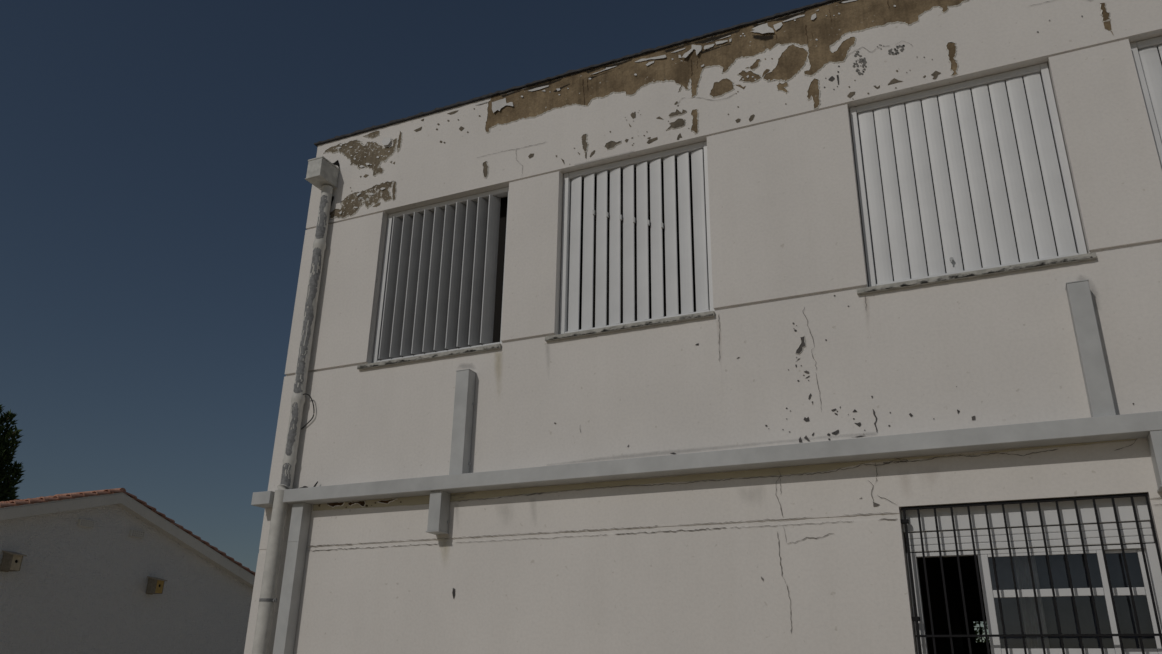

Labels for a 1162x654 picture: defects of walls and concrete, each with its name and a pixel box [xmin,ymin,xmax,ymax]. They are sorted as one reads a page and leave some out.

peeling [474,0,969,165]
peeling [1099,2,1113,34]
peeling [281,119,424,487]
spalling [788,323,813,404]
spalling [765,406,865,442]
crack [309,449,1057,630]